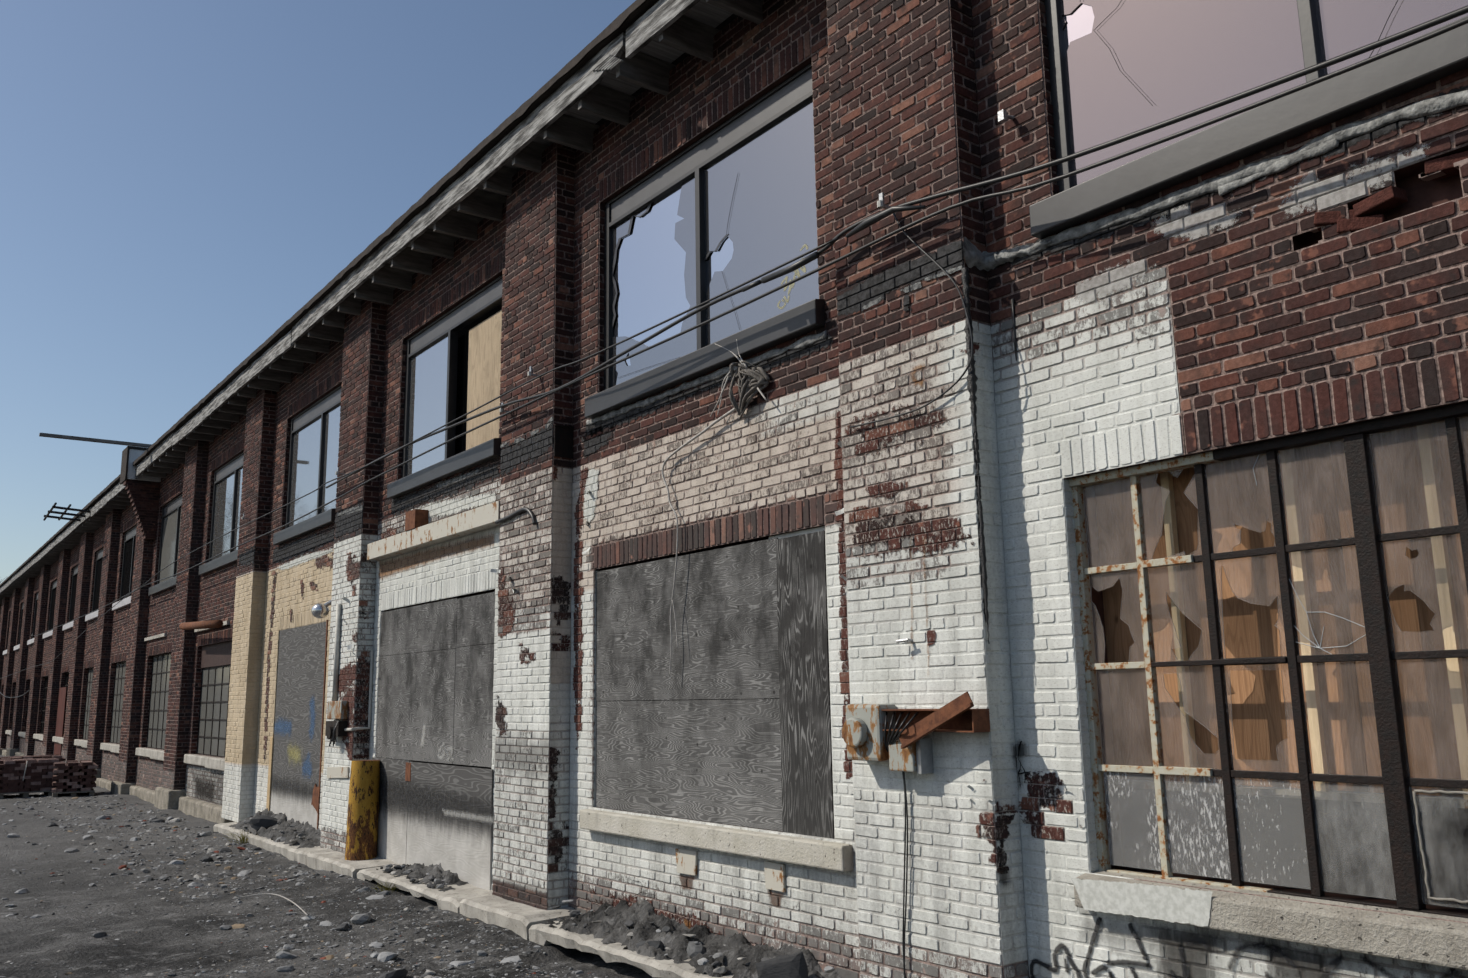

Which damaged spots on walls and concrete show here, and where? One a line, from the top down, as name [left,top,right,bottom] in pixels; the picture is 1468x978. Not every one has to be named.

peeling [263,548,371,761]
peeling [380,525,404,539]
peeling [490,466,599,873]
peeling [834,402,974,779]
peeling [967,769,1082,885]